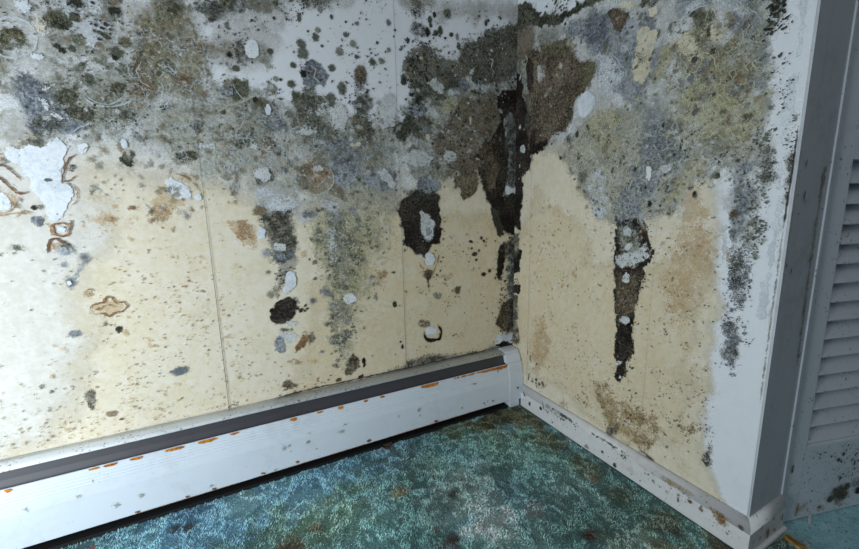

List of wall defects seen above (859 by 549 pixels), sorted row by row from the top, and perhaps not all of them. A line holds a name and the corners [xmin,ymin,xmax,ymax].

damp [295,0,330,22]
damp [401,0,433,20]
damp [427,2,456,28]
peeling [4,137,101,227]
damp [778,114,800,226]
damp [797,161,832,361]
damp [803,442,859,506]